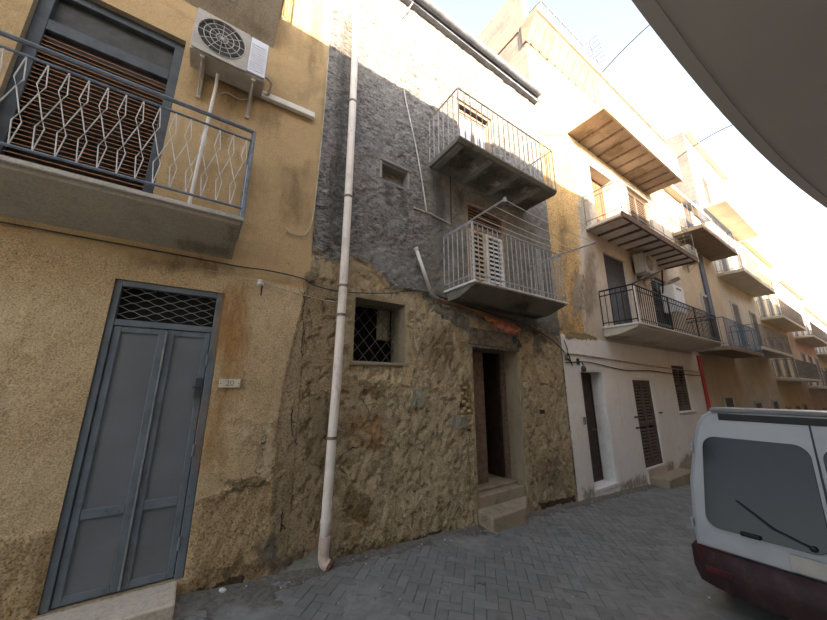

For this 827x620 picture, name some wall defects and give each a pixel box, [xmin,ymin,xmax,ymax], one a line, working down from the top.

flaking render [579,190,590,231]
flaking render [315,249,469,329]
flaking render [564,333,597,341]
flaking render [354,364,414,399]
flaking render [459,379,473,415]
spalling [539,486,576,510]
spalling [340,505,449,557]